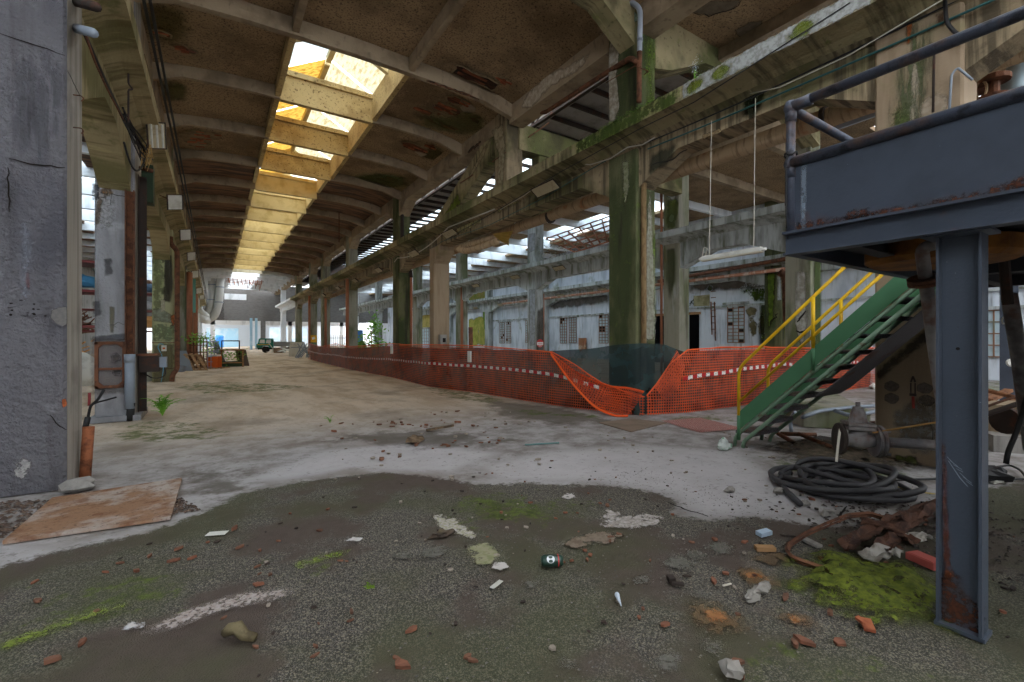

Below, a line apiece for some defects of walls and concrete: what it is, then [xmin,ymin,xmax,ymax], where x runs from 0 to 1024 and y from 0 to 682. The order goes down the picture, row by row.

crack [6,158,65,212]
corrosion [796,177,1024,229]
corrosion [941,446,978,633]